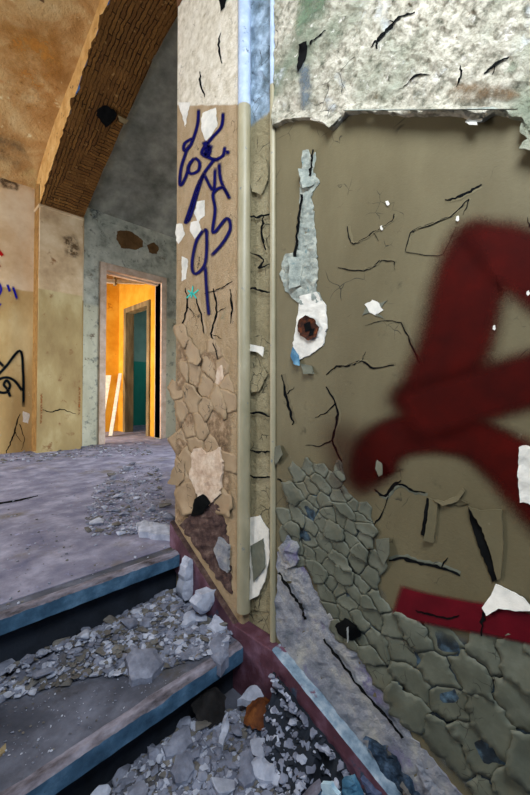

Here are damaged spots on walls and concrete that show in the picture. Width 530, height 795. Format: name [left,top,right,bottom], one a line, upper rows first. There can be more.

crack [371,11,415,49]
flaking render [271,0,530,151]
crack [484,57,509,74]
spalling [175,200,205,244]
flaking render [279,149,322,305]
crack [338,184,482,272]
crack [0,495,38,504]
peeling [167,324,237,594]
crack [281,352,396,501]
spalling [517,445,530,505]
crack [389,554,461,576]
peeling [249,457,530,795]